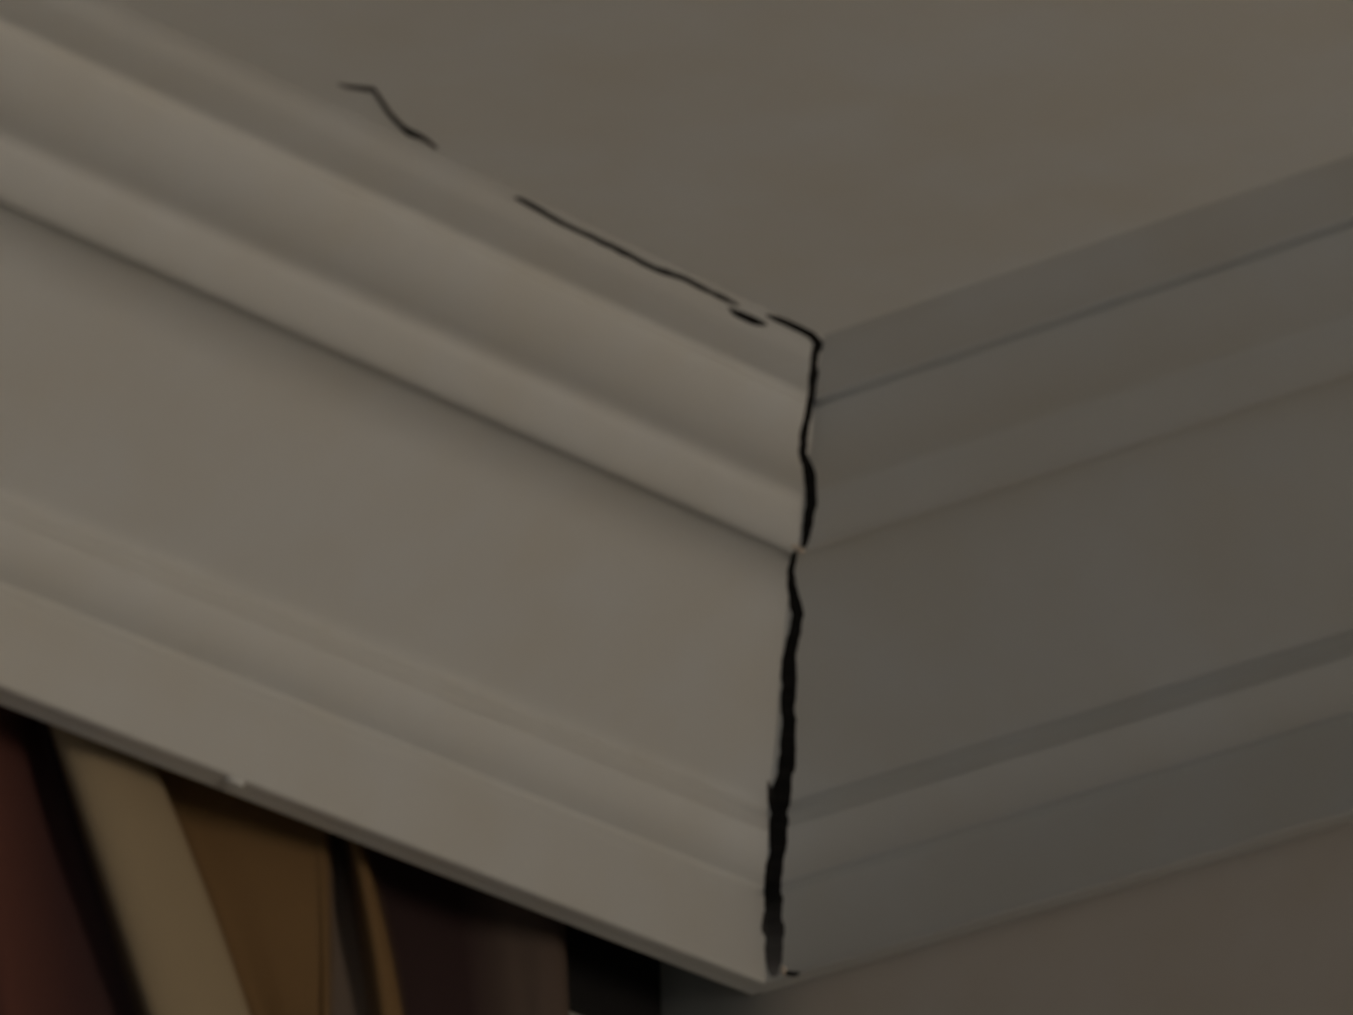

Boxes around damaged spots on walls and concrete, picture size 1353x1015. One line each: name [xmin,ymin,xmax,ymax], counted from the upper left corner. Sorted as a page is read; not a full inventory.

crack [338,83,437,150]
crack [515,196,823,977]